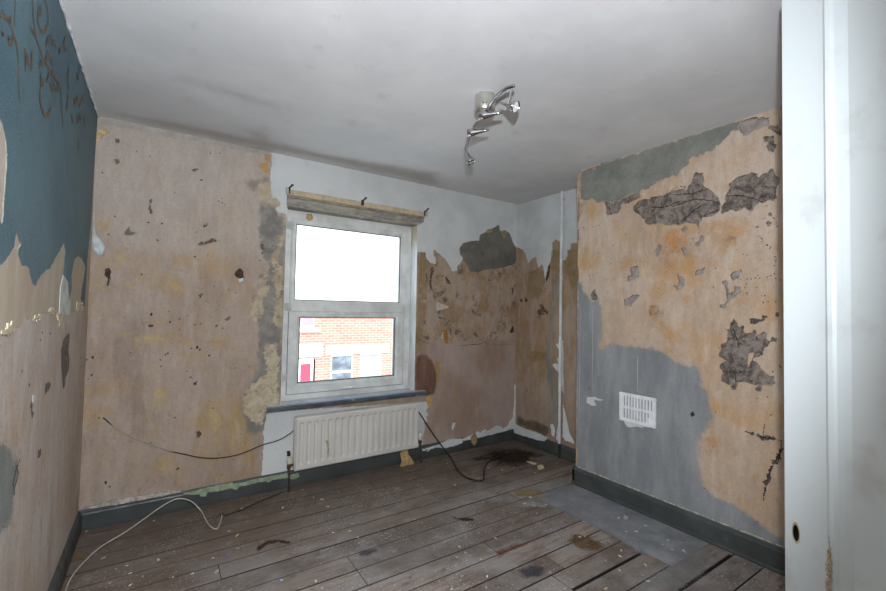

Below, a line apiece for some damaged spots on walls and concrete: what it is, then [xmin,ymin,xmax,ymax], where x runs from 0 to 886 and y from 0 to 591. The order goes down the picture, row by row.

flaking render [739,117,782,152]
flaking render [604,169,781,399]
peeling [1,321,15,336]
water stain [415,252,440,397]
peeling [553,340,564,394]
peeling [184,404,389,497]
peeling [418,402,428,446]
peeling [550,407,575,444]
crack [745,424,784,501]